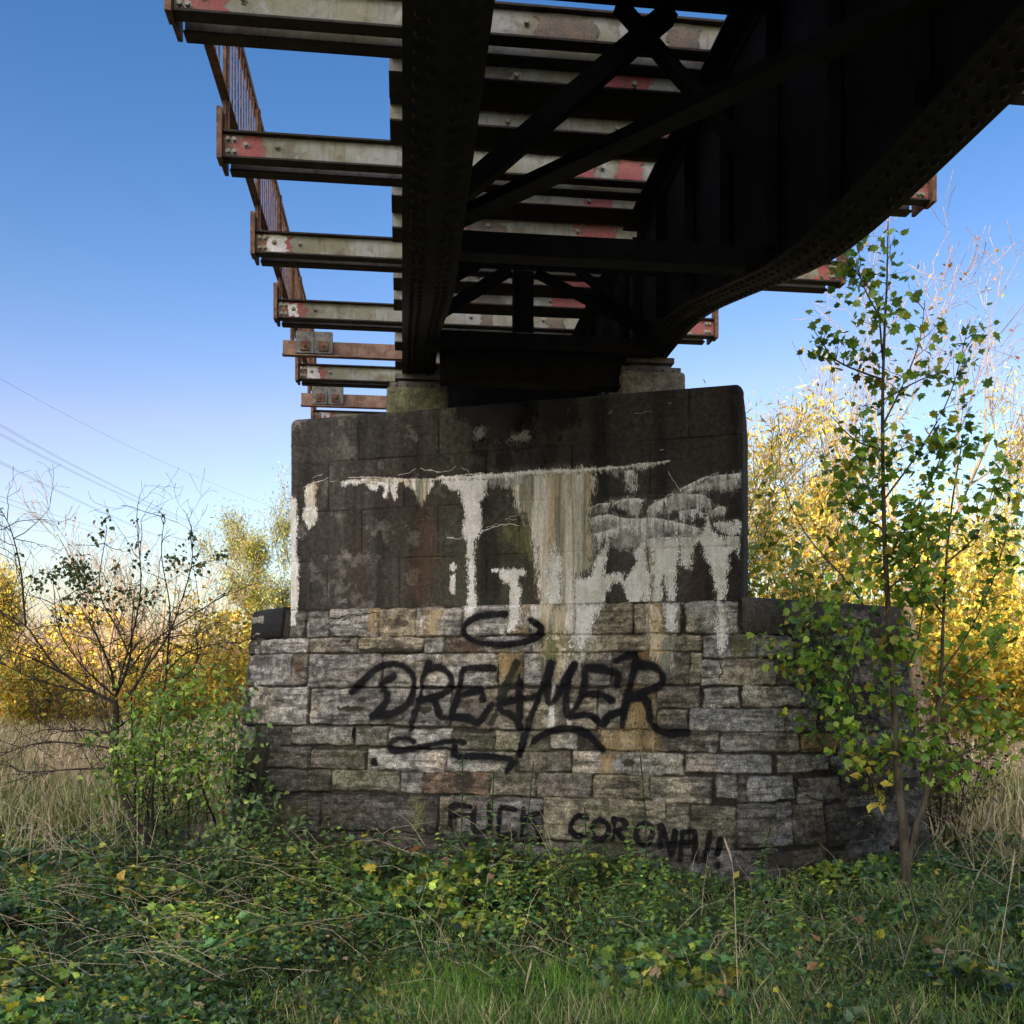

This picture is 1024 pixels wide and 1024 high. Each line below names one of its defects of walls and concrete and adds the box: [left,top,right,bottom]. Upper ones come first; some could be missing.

peeling [256,234,289,252]
damp [290,482,318,627]
damp [341,397,754,738]